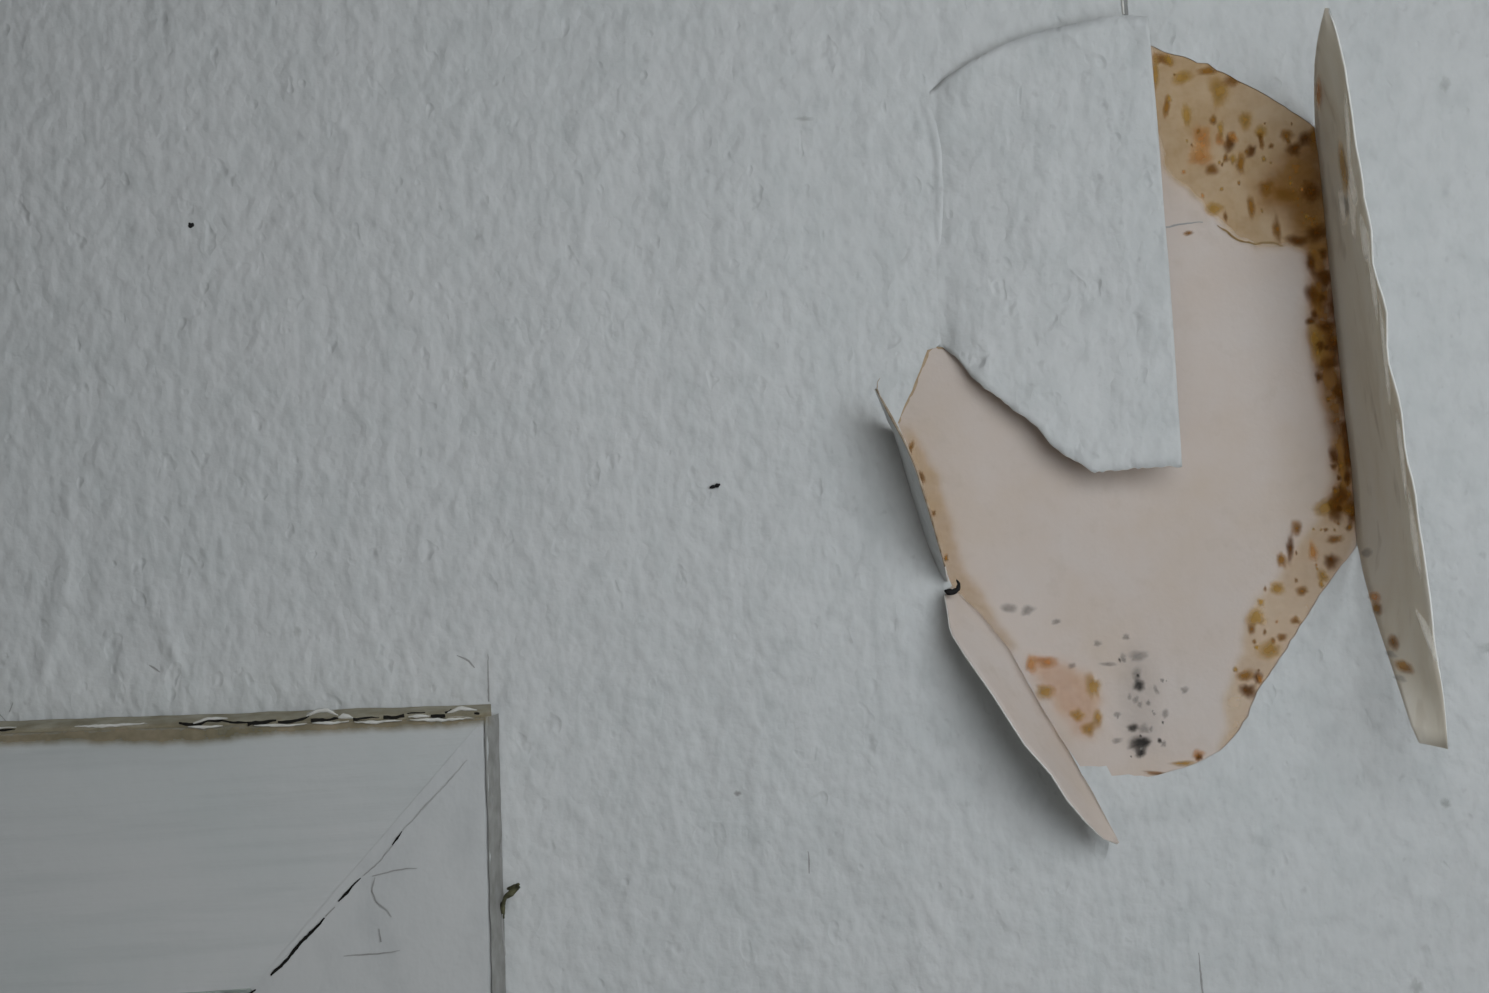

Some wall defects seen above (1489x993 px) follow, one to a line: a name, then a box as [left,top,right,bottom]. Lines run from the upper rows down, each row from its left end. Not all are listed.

damp [1153,50,1375,696]
crack [0,703,15,732]
crack [75,655,490,729]
damp [1073,712,1101,733]
damp [1129,721,1202,775]
crack [250,760,467,993]